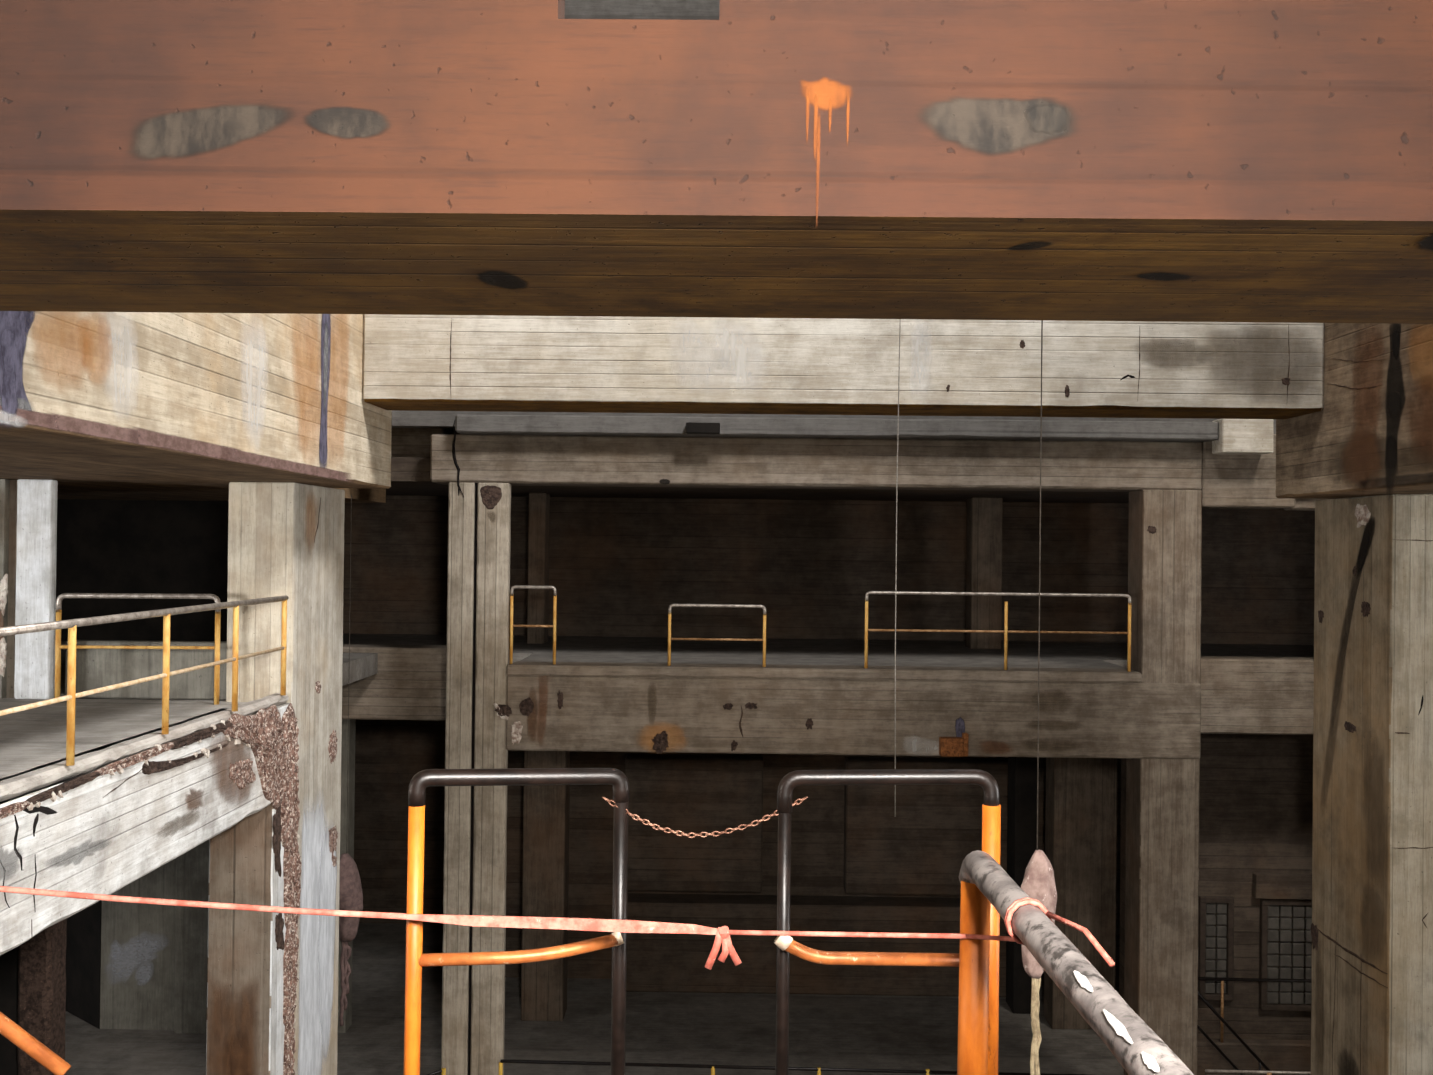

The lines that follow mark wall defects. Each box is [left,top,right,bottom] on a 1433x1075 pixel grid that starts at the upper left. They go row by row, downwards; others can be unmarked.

rust [1362,473,1433,488]
leakage [1325,519,1375,784]
crack [0,773,83,934]
spalling [0,703,302,1075]